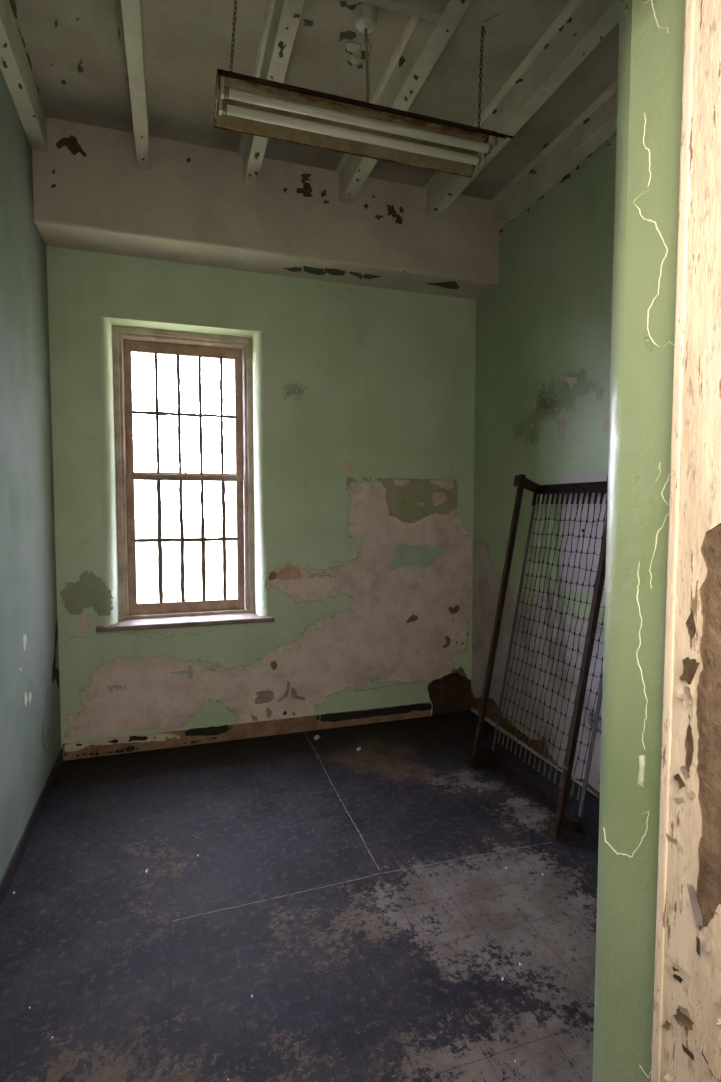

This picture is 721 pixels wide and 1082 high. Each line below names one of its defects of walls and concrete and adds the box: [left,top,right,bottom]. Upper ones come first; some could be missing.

peeling [9,0,33,70]
peeling [338,31,371,69]
peeling [56,135,86,157]
peeling [283,173,329,204]
peeling [363,195,404,224]
crack [633,113,674,348]
peeling [282,266,382,279]
peeling [64,480,604,795]
peeling [674,523,721,956]
peeling [670,961,691,985]
peeling [662,1002,716,1082]